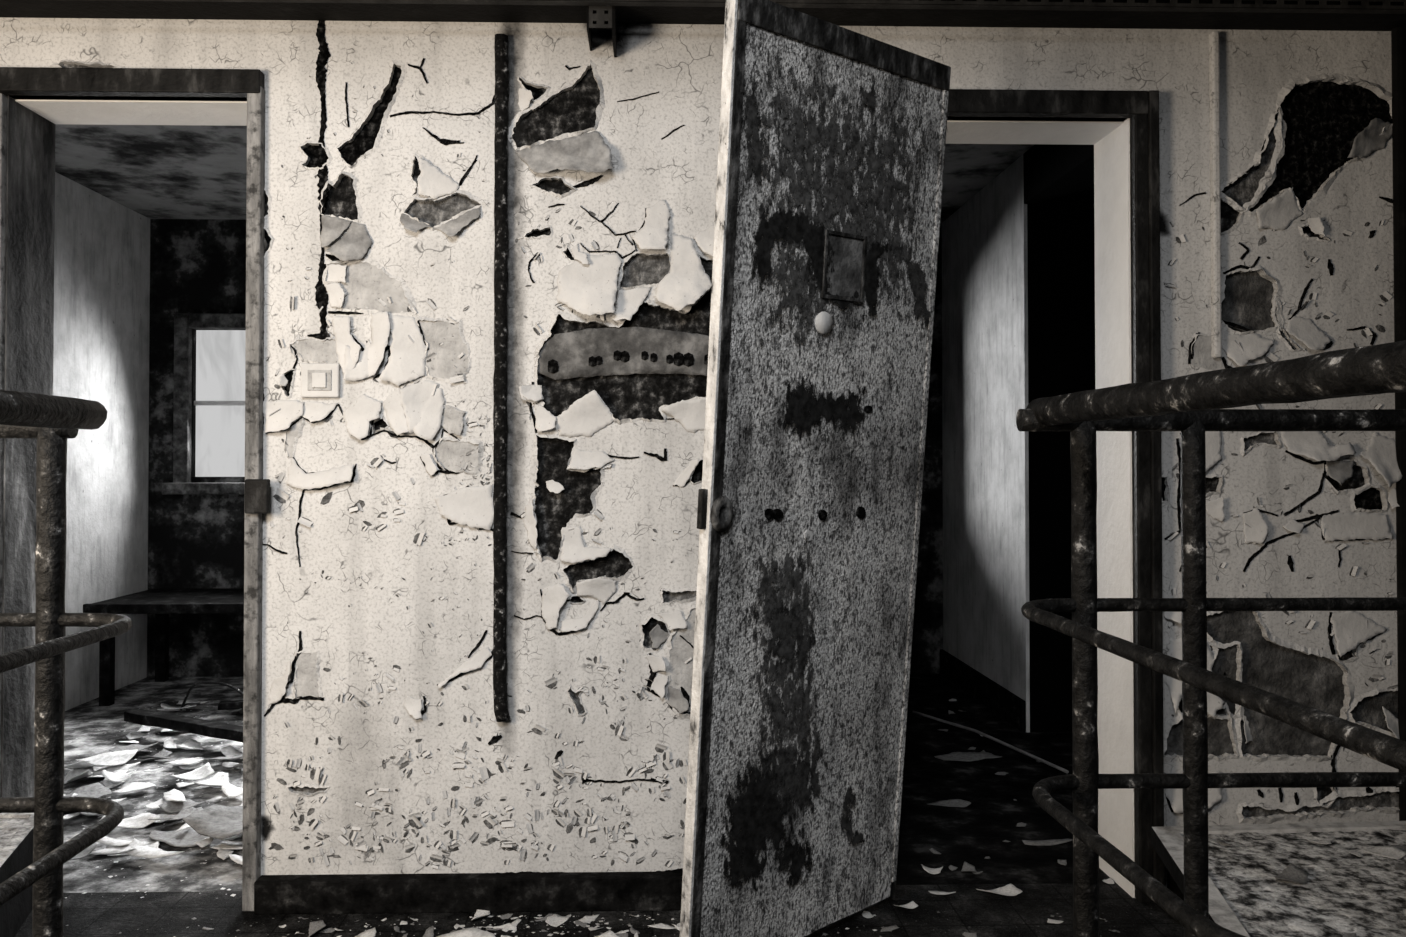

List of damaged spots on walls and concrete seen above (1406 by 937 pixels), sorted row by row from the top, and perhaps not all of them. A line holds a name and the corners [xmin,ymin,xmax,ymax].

crack [315,20,363,340]
crack [390,58,495,186]
peeling [729,38,940,442]
flaking render [1180,73,1393,372]
flaking render [262,59,732,869]
peeling [717,530,830,893]
peeling [840,783,864,846]
flaking render [1164,567,1182,660]
flaking render [1163,675,1183,763]
peeling [1165,789,1183,814]
flaking render [1205,431,1402,739]
flaking render [1207,692,1400,824]